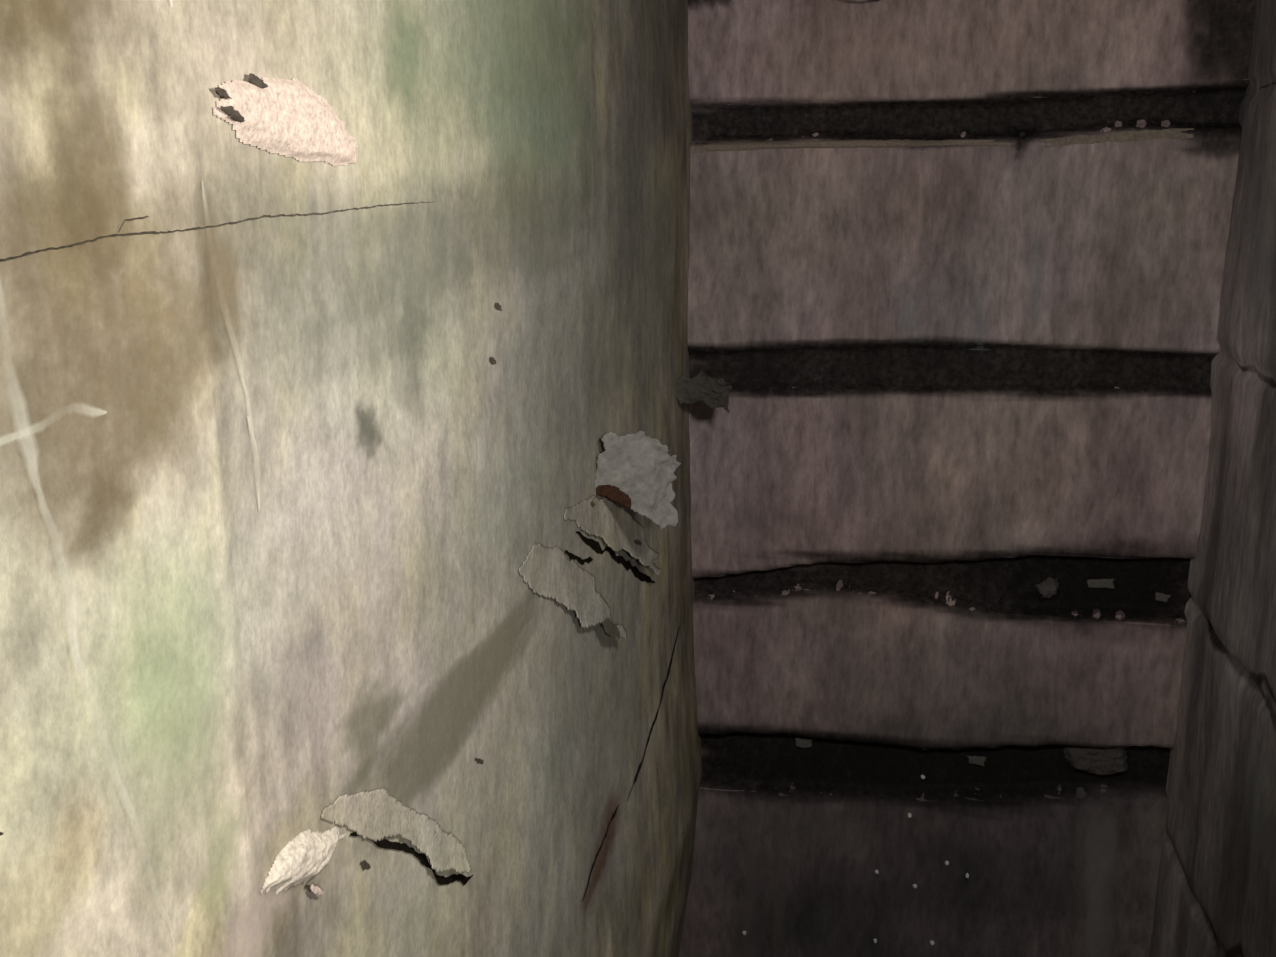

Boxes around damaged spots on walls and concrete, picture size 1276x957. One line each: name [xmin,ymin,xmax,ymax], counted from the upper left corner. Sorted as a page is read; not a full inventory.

damp [0,0,86,52]
spalling [213,73,358,166]
crack [0,201,434,261]
damp [0,107,212,495]
peeling [564,430,681,576]
peeling [519,542,627,639]
crack [1204,614,1227,653]
crack [1253,674,1276,724]
peeling [261,788,471,895]